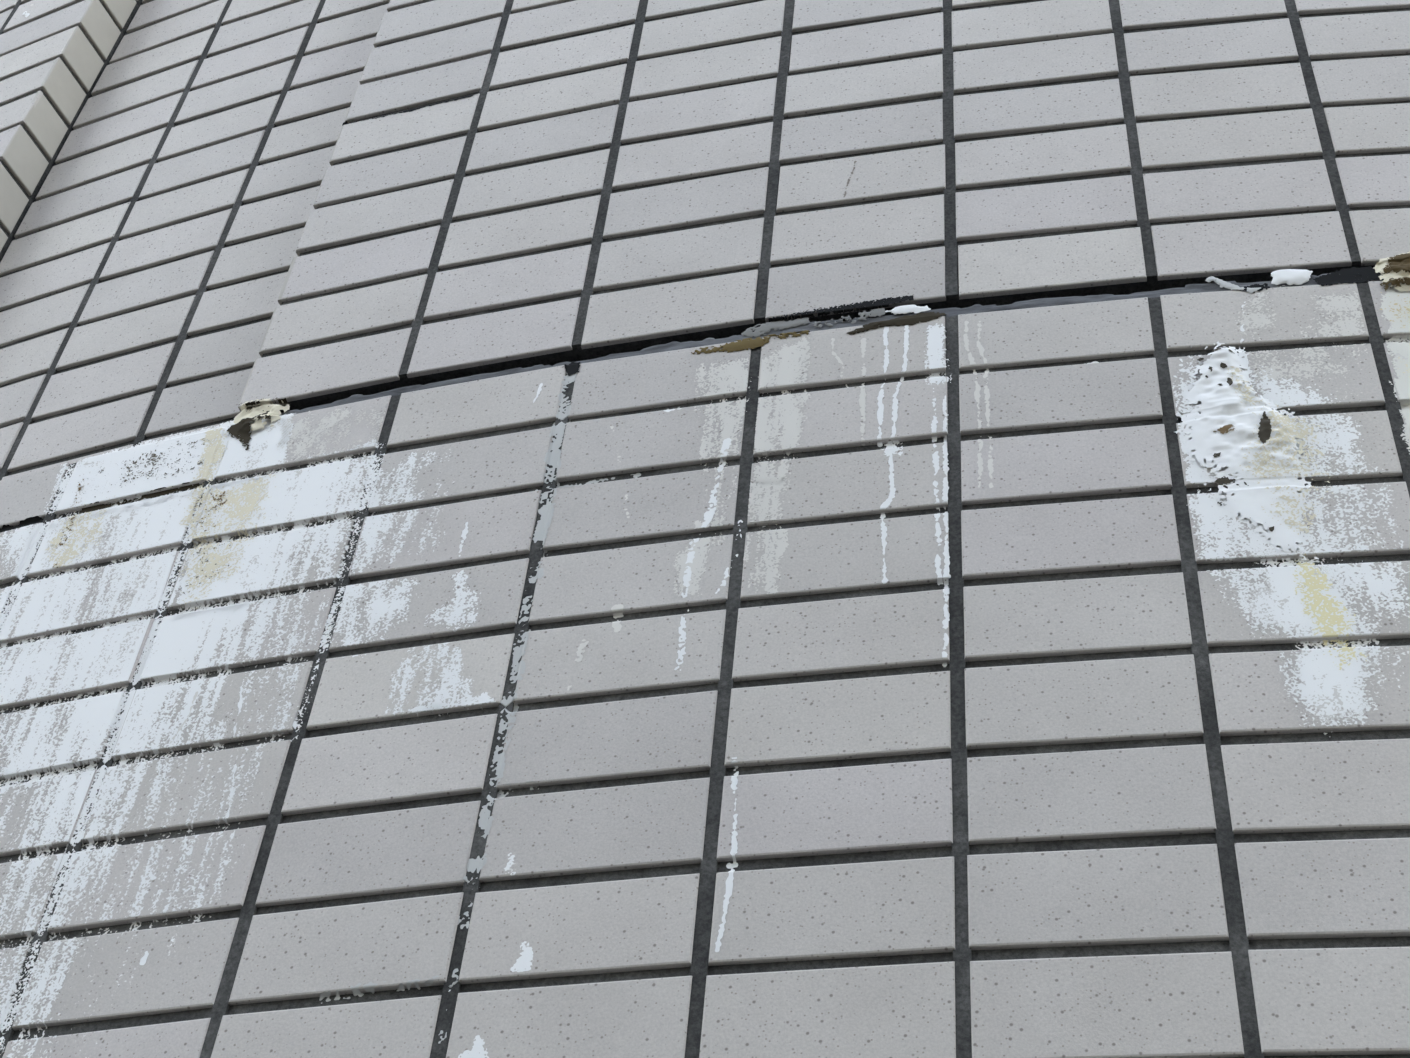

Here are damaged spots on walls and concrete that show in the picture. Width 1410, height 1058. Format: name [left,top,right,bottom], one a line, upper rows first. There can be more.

spalling [227,398,290,450]
damp [663,337,811,671]
crack [768,295,914,322]
damp [831,323,952,667]
damp [963,321,994,488]
damp [1156,283,1410,727]
spalling [1373,252,1410,292]
damp [0,372,641,1058]